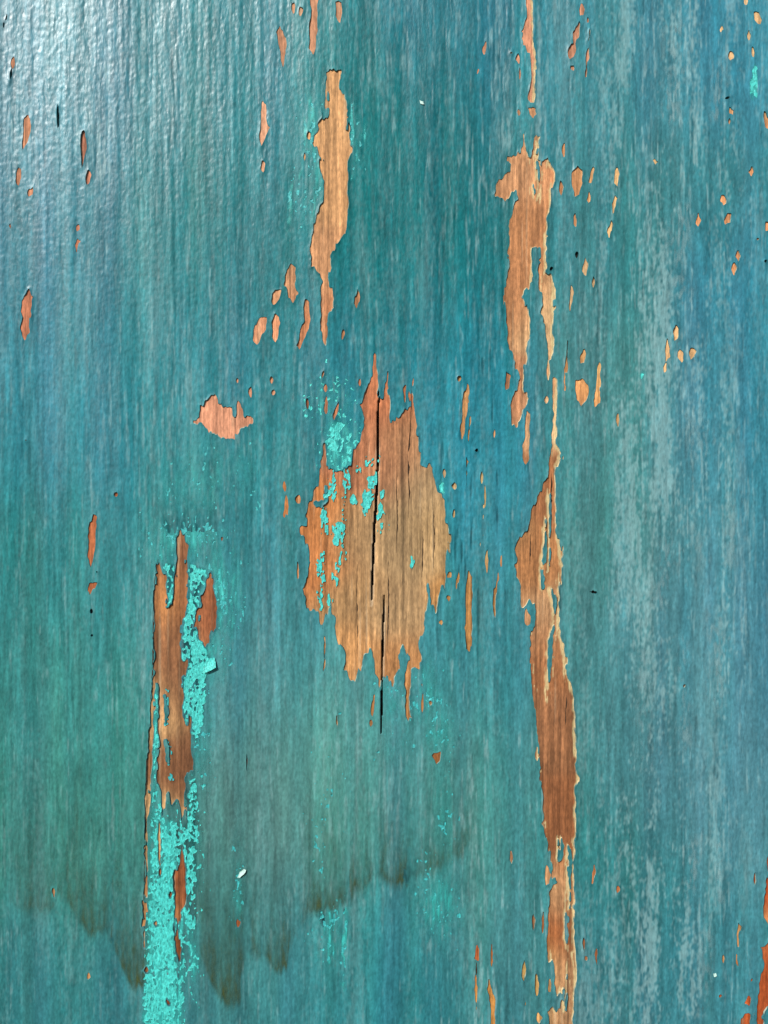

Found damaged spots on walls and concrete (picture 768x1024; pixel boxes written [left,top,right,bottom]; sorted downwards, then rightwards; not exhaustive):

peeling [253,68,366,349]
peeling [138,378,254,1024]
peeling [283,353,473,765]
crack [356,391,435,740]
peeling [480,134,601,1024]